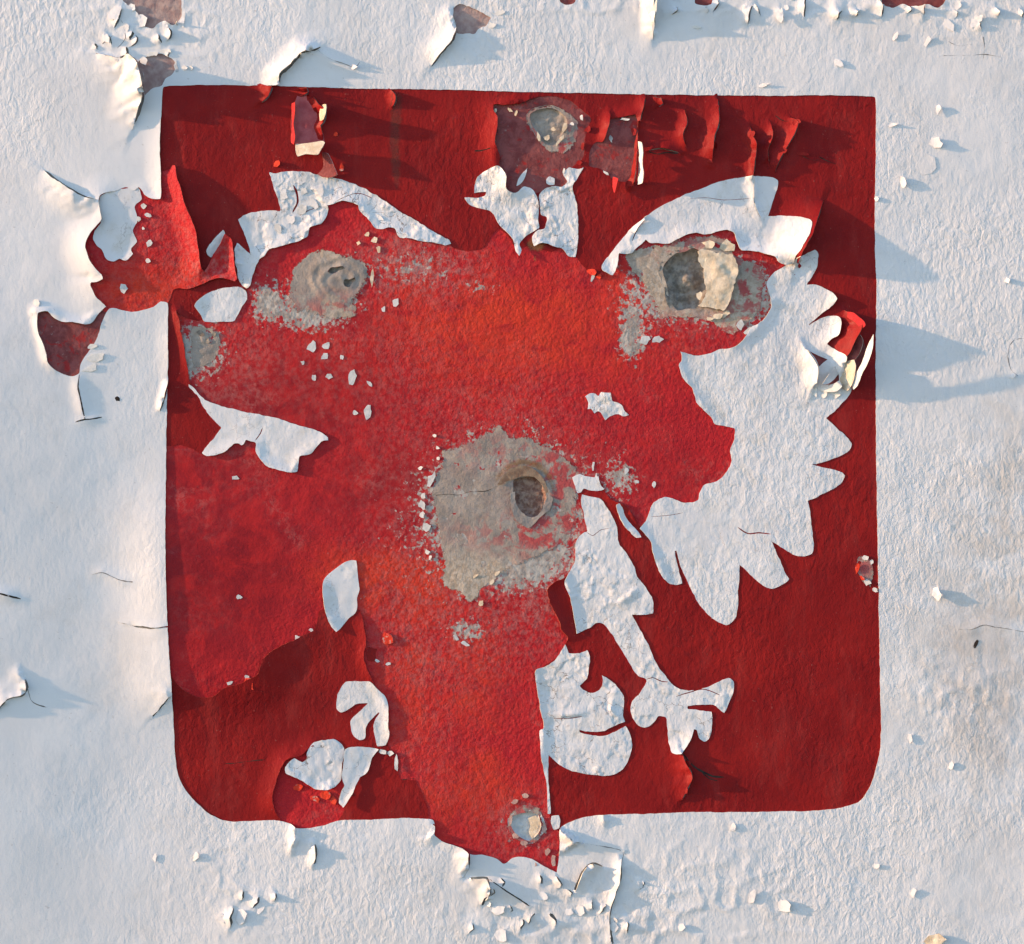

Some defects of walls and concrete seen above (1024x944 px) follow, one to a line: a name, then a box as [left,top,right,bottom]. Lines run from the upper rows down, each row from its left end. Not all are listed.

peeling [86,0,193,130]
peeling [413,4,505,66]
peeling [801,310,874,399]
peeling [33,94,784,943]